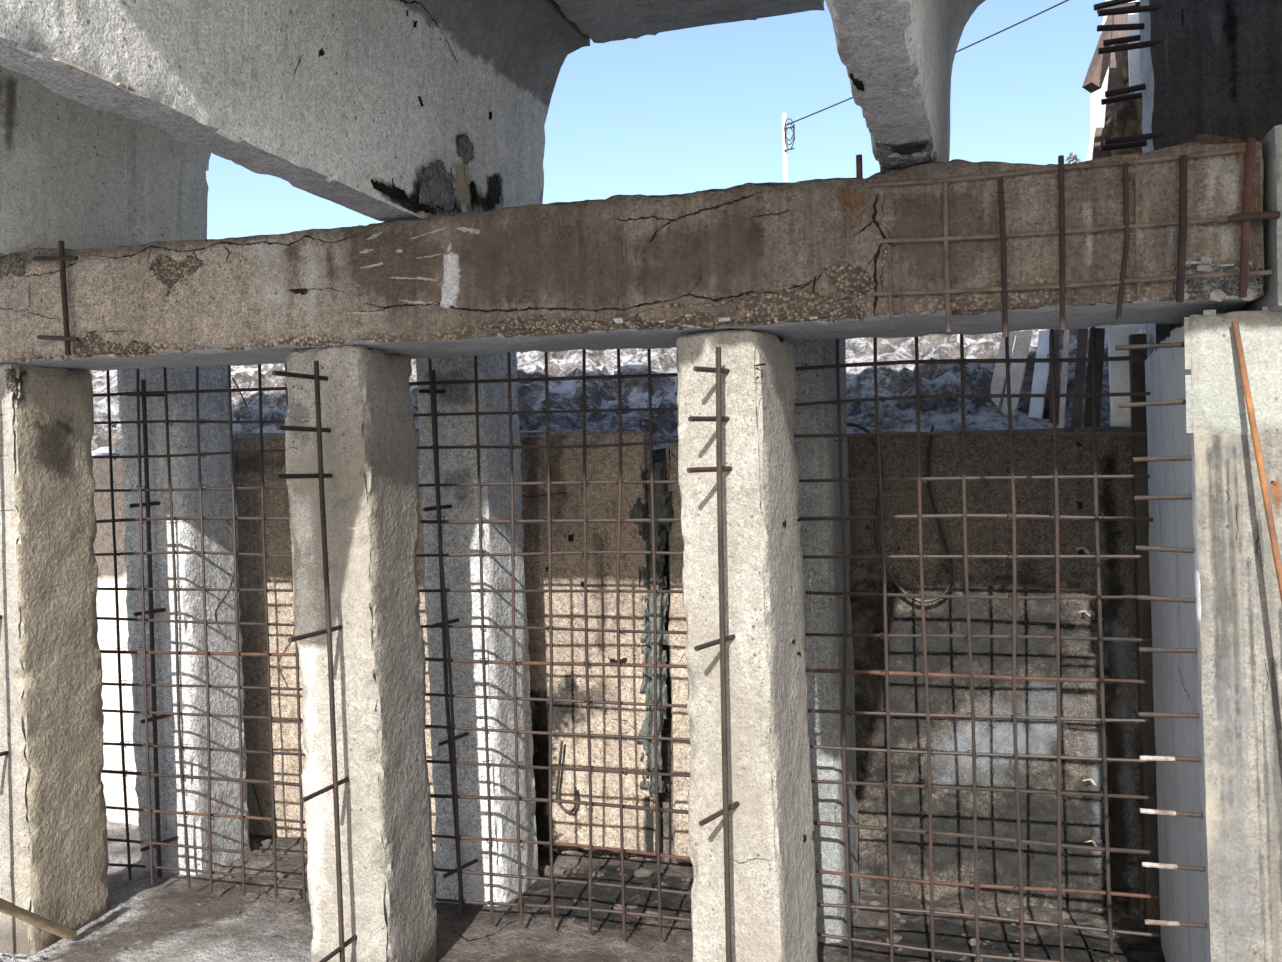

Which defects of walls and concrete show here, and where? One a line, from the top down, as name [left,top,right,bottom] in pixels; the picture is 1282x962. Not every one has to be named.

crack [0,233,363,334]
spalling [359,232,438,281]
spalling [370,134,503,258]
crack [615,192,793,243]
crack [855,190,895,316]
spalling [0,240,357,962]
spalling [409,127,1280,962]
leakage [839,454,1165,962]
leakage [1208,437,1264,756]
leakage [1257,609,1282,896]